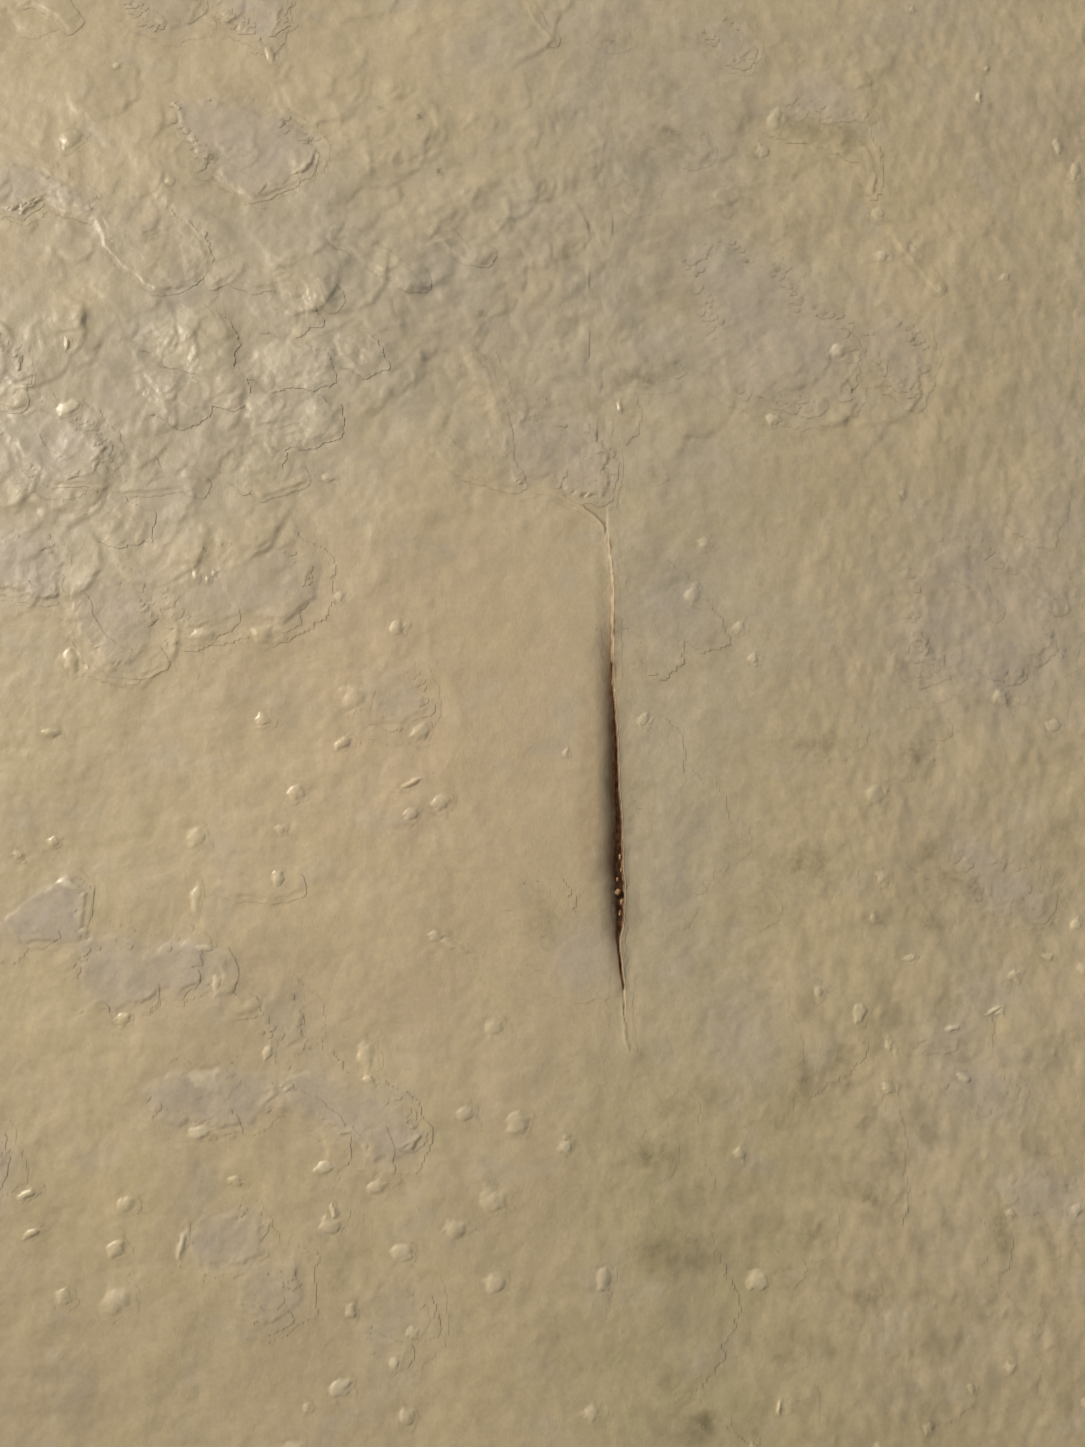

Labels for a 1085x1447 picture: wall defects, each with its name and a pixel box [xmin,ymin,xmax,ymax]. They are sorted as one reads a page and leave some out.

peeling [158,87,330,208]
crack [558,489,638,1056]